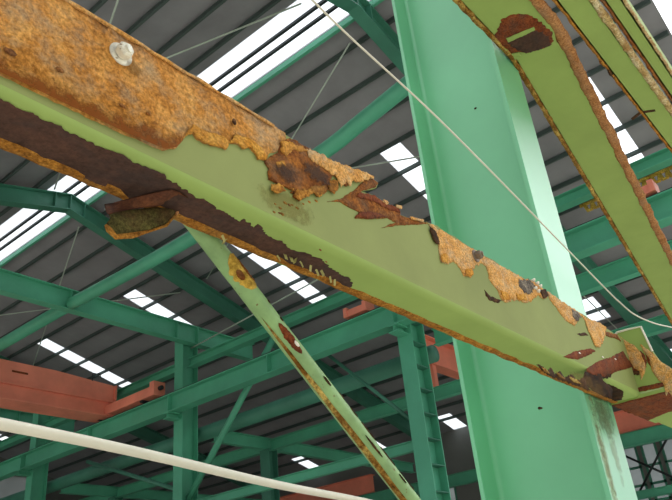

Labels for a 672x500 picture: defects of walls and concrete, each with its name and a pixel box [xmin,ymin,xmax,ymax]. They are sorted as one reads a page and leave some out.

peeling [0,98,353,288]
rust [0,0,621,348]
rust [263,320,407,500]
rust [0,138,672,421]
rust [452,0,672,325]